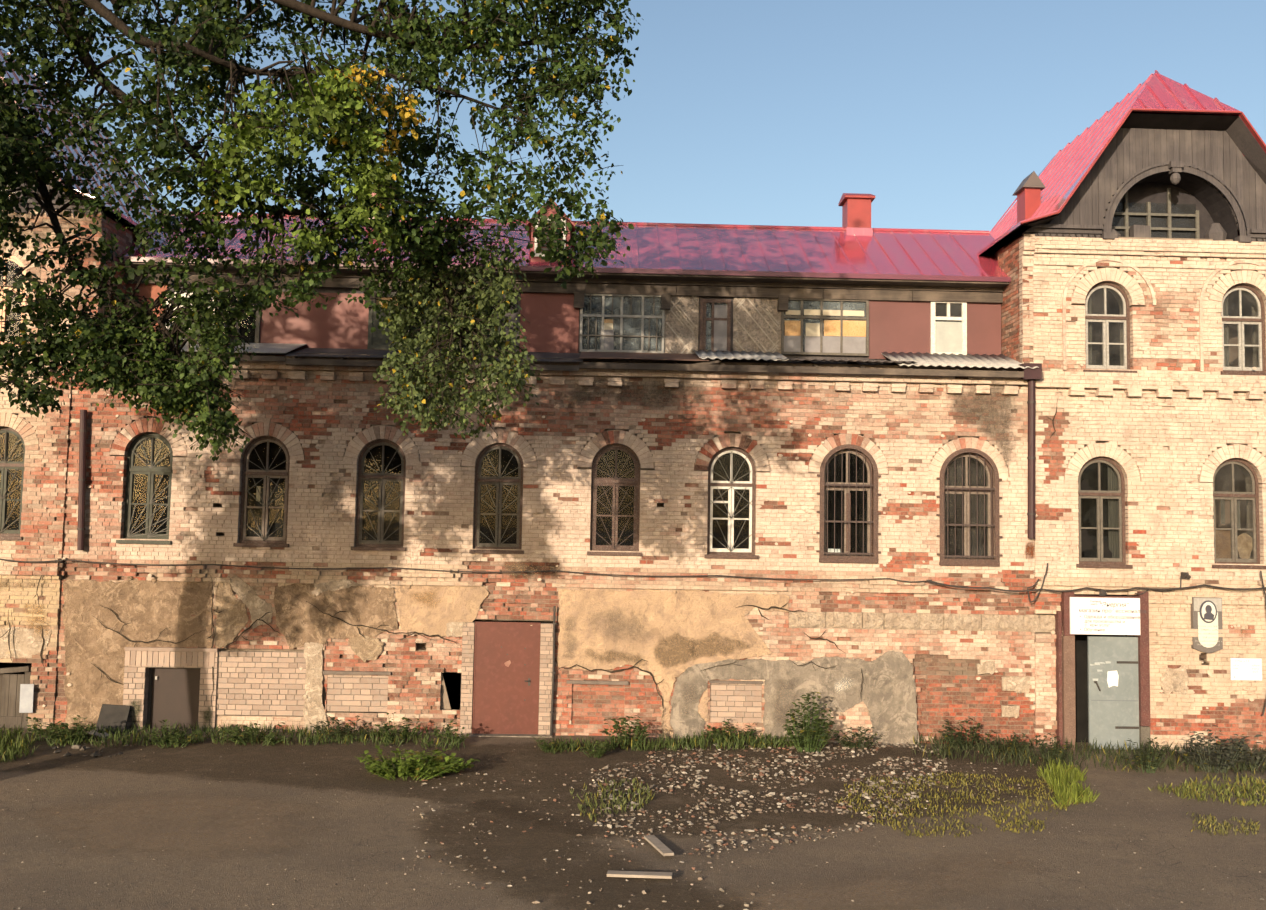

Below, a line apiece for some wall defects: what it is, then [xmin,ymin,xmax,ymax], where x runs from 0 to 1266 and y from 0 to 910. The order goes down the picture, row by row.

peeling [0,357,1061,748]
crack [93,575,279,710]
crack [306,601,456,643]
water stain [592,651,641,663]
water stain [655,634,748,666]